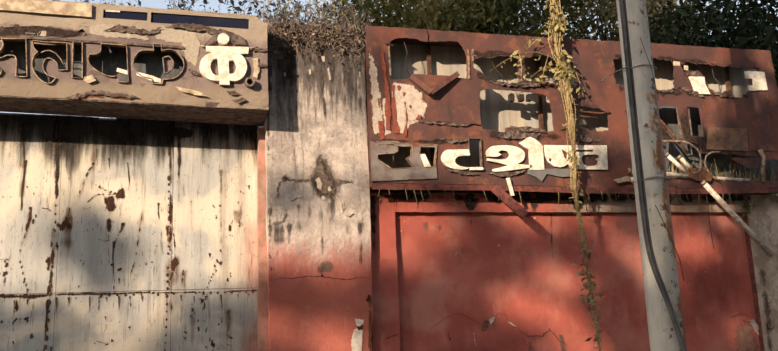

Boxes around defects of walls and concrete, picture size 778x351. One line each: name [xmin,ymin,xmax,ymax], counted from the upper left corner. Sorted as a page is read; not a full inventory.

leakage [268,48,361,116]
corrosion [21,131,37,238]
leakage [0,114,257,196]
leakage [157,194,172,251]
leakage [44,244,55,351]
corrosion [0,177,222,351]
crack [272,272,367,281]
peeling [351,294,373,351]